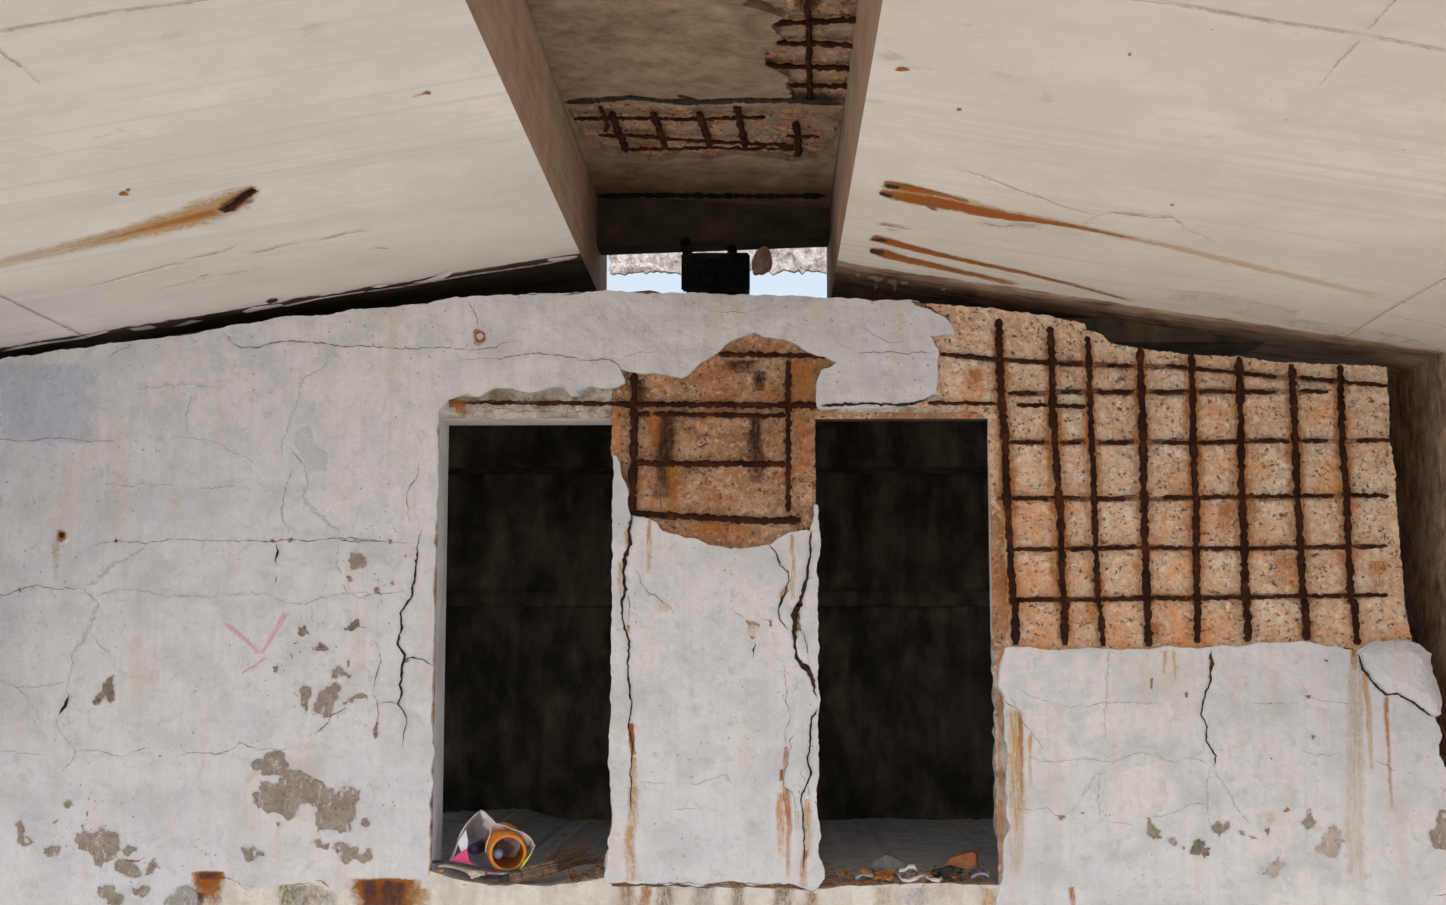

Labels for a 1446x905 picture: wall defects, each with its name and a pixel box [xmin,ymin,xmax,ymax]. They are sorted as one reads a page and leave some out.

spalling [766,0,856,100]
spalling [574,106,819,158]
rust [55,187,259,251]
rust [870,236,1123,299]
rust [879,181,1155,245]
spalling [451,334,835,549]
crack [0,304,646,766]
spalling [899,288,1412,883]
crack [609,514,818,893]
crack [1000,652,1241,826]
peeling [15,799,160,905]
peeling [251,751,373,865]